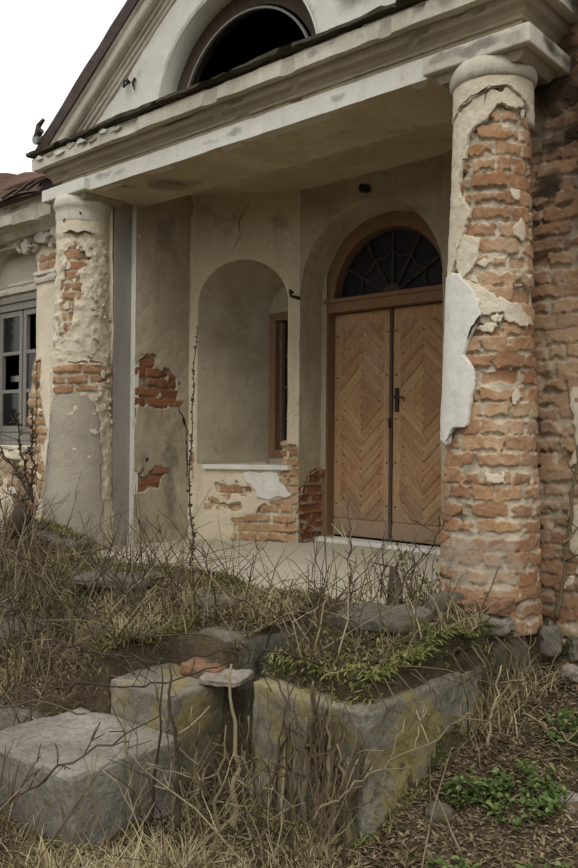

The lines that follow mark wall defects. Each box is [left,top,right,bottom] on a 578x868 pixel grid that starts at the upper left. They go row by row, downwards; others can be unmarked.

flaking render [38,241,112,337]
flaking render [440,74,535,445]
flaking render [0,356,48,519]
flaking render [52,336,113,436]
flaking render [132,457,170,496]
flaking render [132,353,183,437]
flaking render [204,440,325,543]
flaking render [484,472,506,484]
flaking render [567,387,578,467]
flaking render [560,505,578,589]